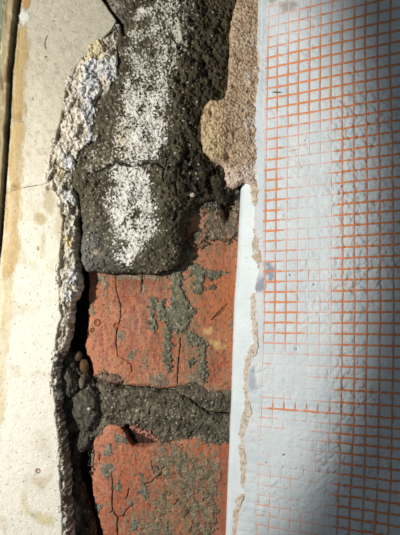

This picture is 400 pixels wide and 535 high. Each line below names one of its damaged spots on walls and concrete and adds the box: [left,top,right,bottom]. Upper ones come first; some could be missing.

water stain [2,27,27,277]
spalling [44,24,122,535]
efflorescence [83,0,198,269]
peeling [250,185,259,206]
peeling [251,229,262,268]
crack [110,477,132,535]
spalling [125,424,160,444]
peeling [231,293,259,535]